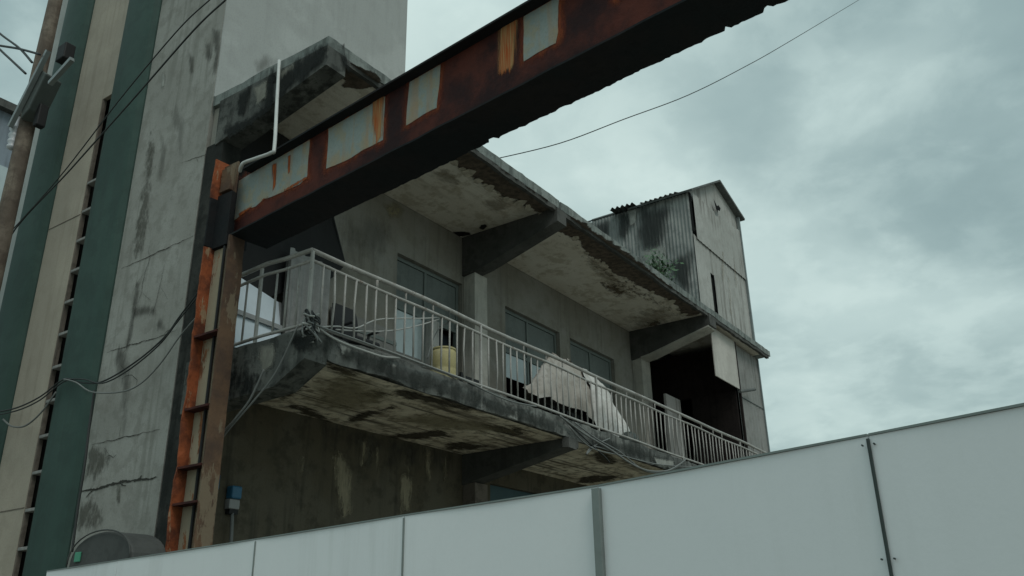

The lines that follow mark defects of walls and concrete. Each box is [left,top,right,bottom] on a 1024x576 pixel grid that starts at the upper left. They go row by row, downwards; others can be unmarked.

corrosion [499,0,565,75]
leakage [224,45,328,138]
corrosion [323,95,388,173]
leakage [136,142,154,252]
corrosion [237,139,311,220]
spalling [450,153,550,214]
leakage [597,205,690,289]
leakage [291,331,555,430]
crack [82,429,160,497]
leakage [591,436,673,468]